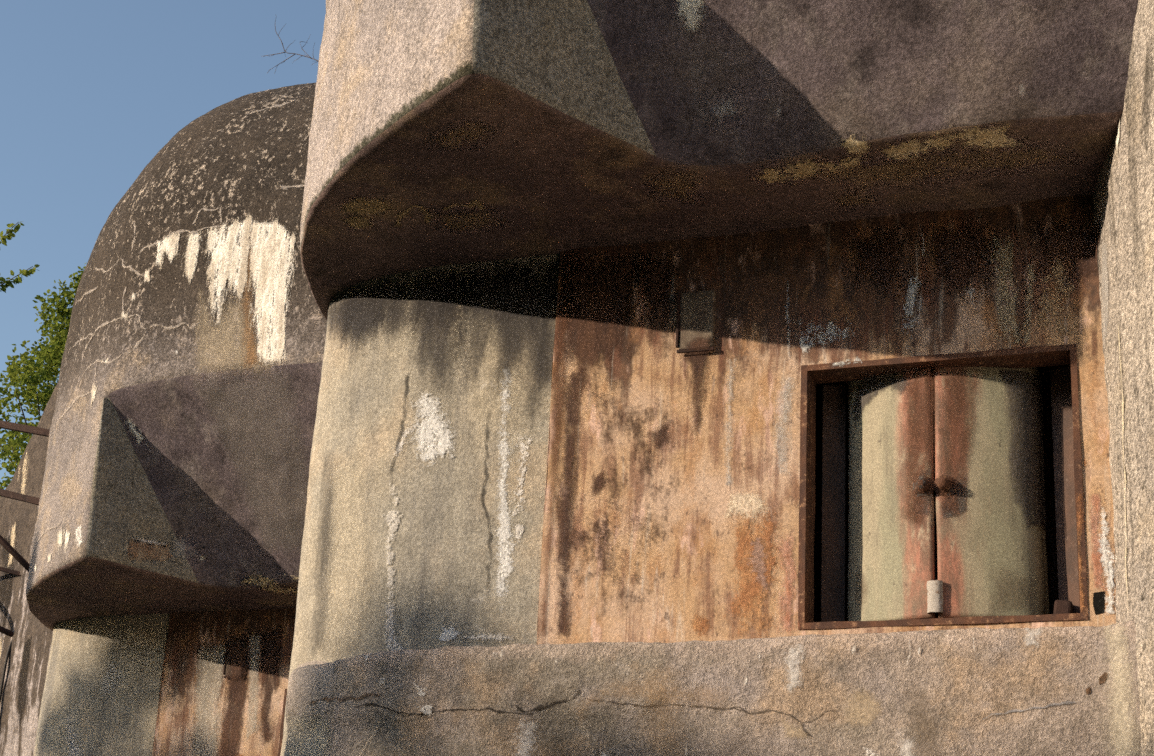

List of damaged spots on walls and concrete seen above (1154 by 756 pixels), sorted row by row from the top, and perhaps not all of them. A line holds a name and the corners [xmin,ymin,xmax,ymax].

crack [59,208,227,419]
damp [144,213,296,366]
crack [391,376,408,471]
damp [327,263,558,596]
crack [481,413,492,583]
rust [731,513,796,634]
damp [853,375,908,420]
rust [906,367,973,523]
damp [1000,370,1046,528]
rust [1077,494,1105,610]
rust [221,630,282,756]
crack [312,692,836,736]